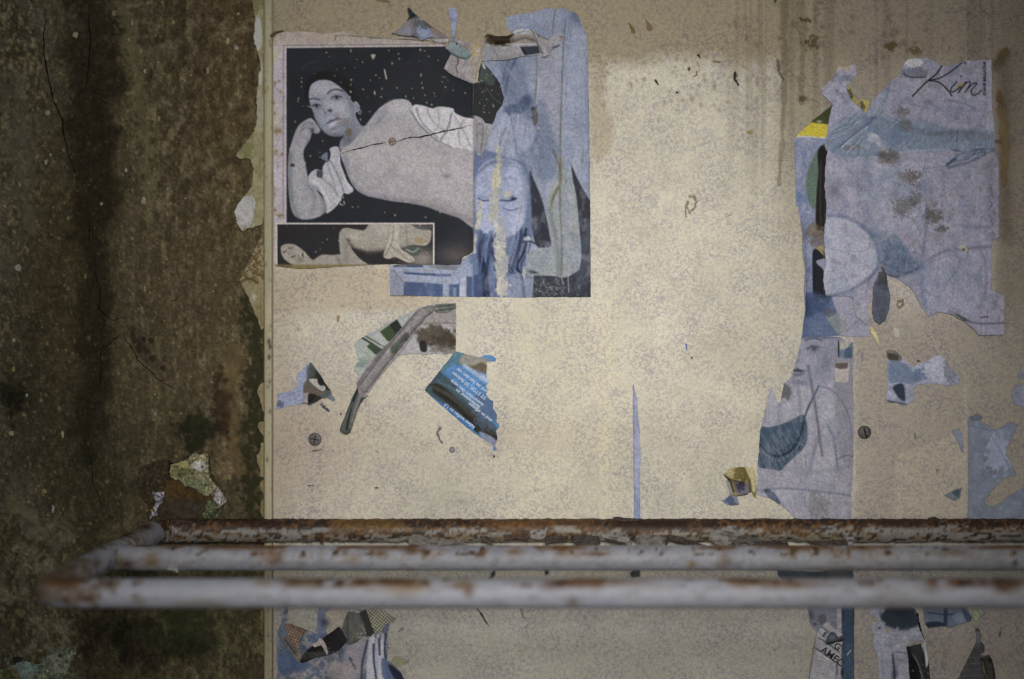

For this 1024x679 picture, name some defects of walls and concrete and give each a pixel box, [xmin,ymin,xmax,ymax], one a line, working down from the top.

crack [42,0,113,190]
flaking render [234,0,264,330]
spalling [138,453,227,522]